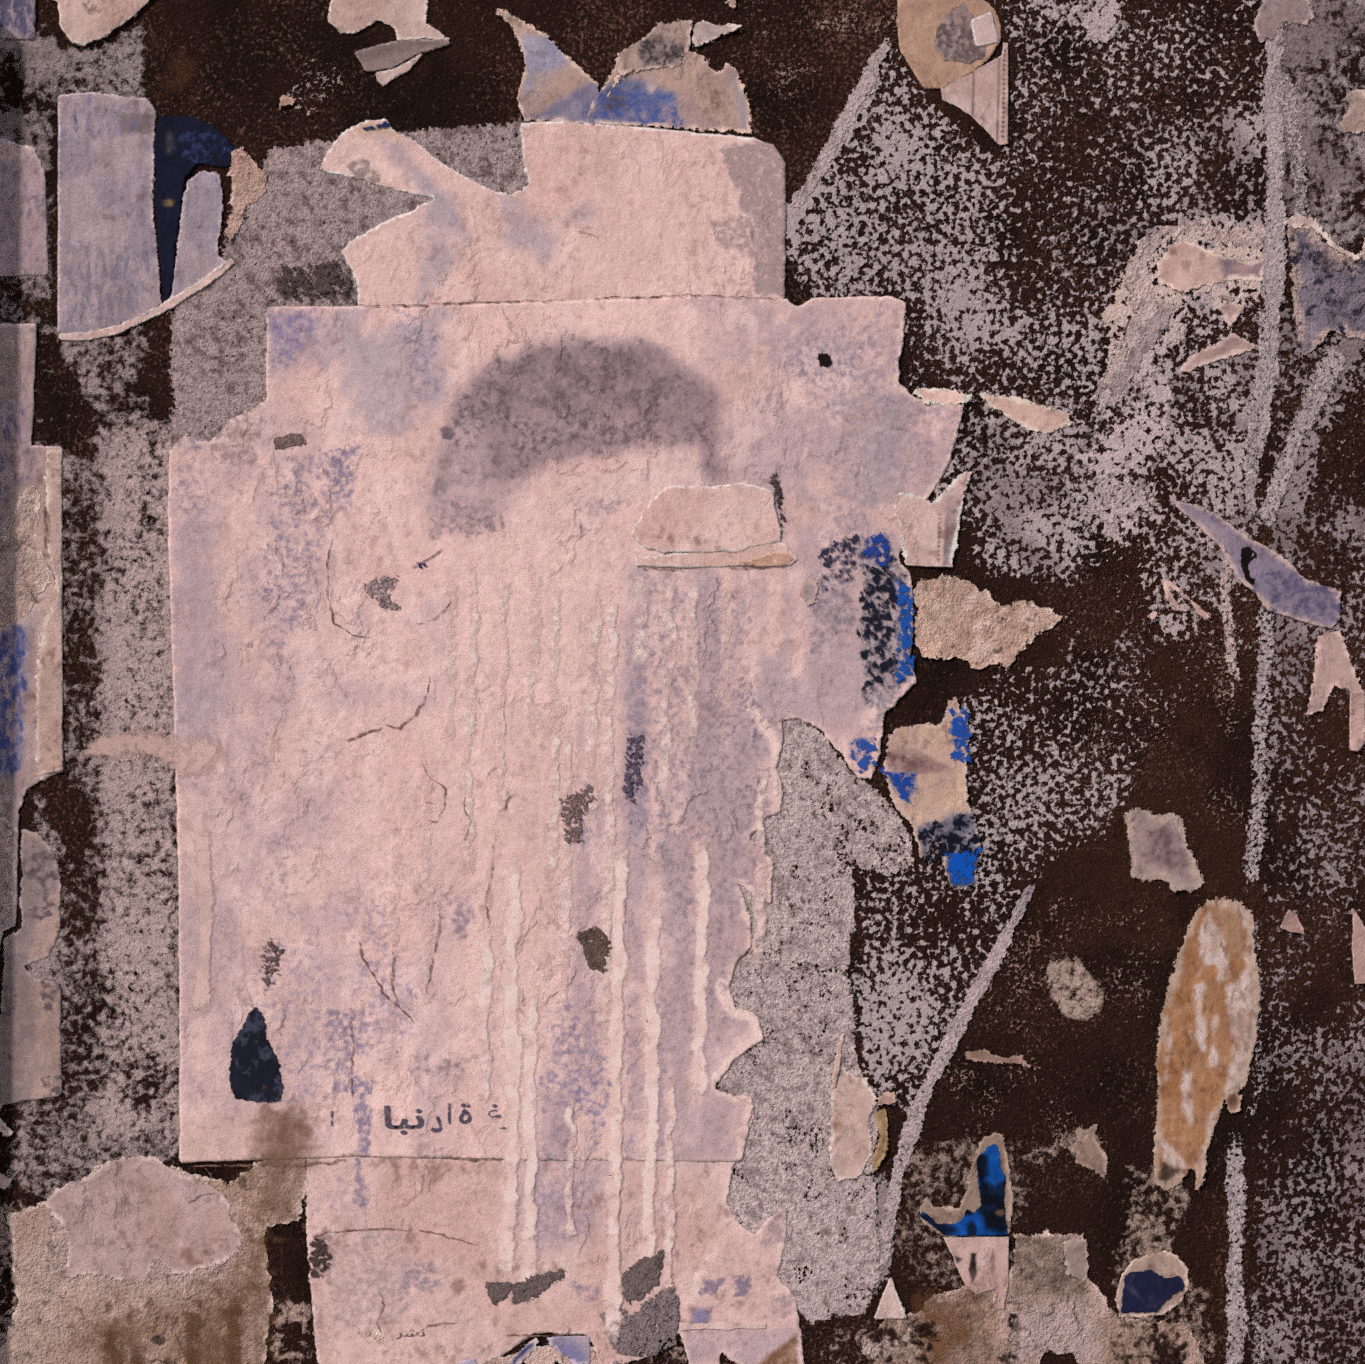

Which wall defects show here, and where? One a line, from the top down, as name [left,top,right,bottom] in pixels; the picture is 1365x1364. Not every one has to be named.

damp [525,571,700,1340]
damp [689,842,711,1099]
damp [752,777,767,963]
damp [476,853,539,1282]
damp [187,1305,240,1364]
peeling [858,1307,940,1364]
peeling [1114,1322,1188,1364]